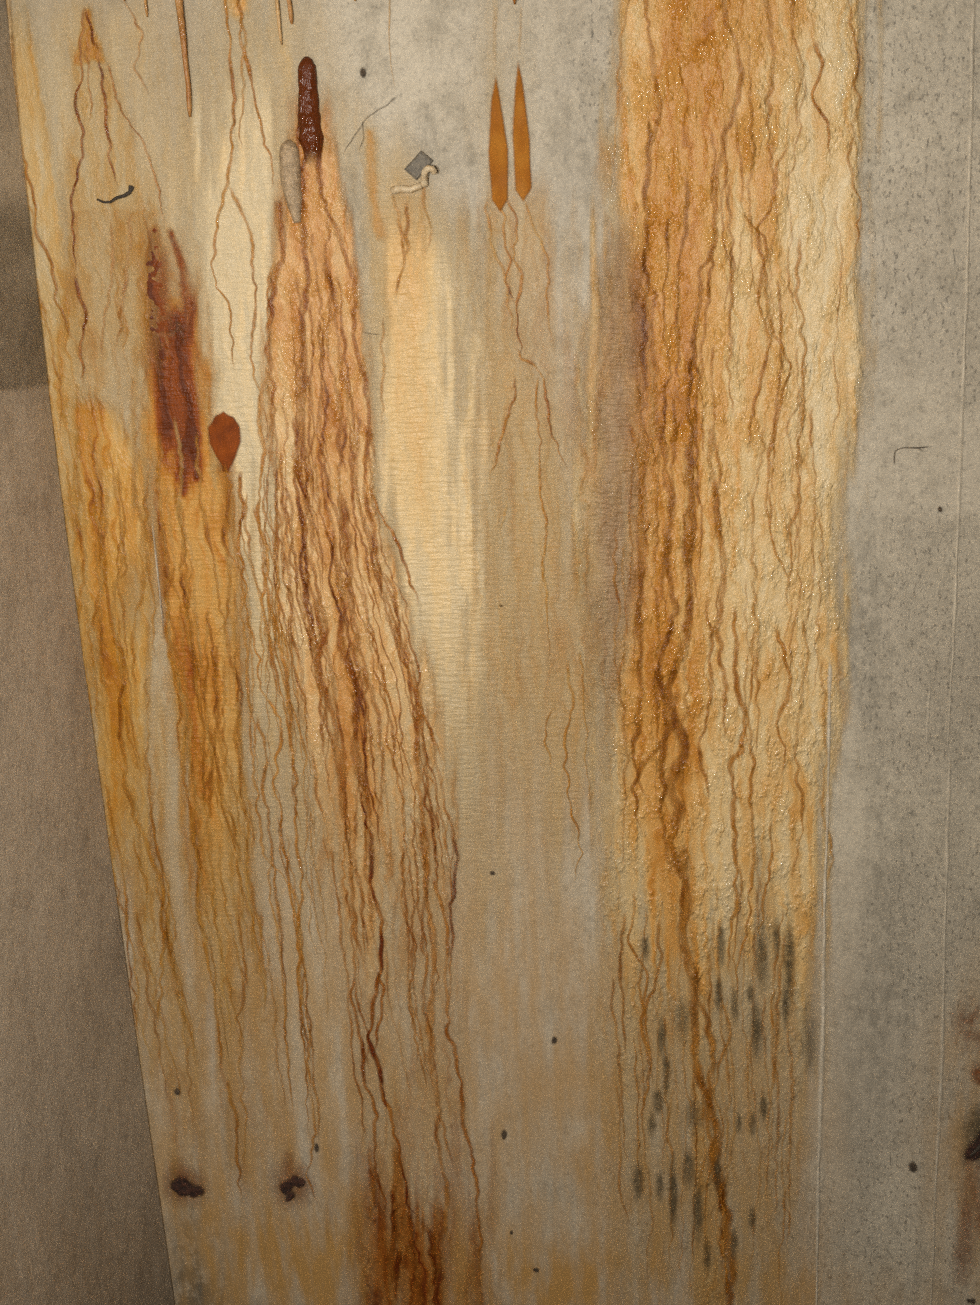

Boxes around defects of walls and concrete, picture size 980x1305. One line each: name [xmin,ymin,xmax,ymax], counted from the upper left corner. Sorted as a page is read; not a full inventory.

leakage [6,0,27,107]
rust [12,8,261,1053]
leakage [40,0,321,1161]
rust [260,56,483,1305]
leakage [366,130,589,810]
rust [484,0,865,1305]